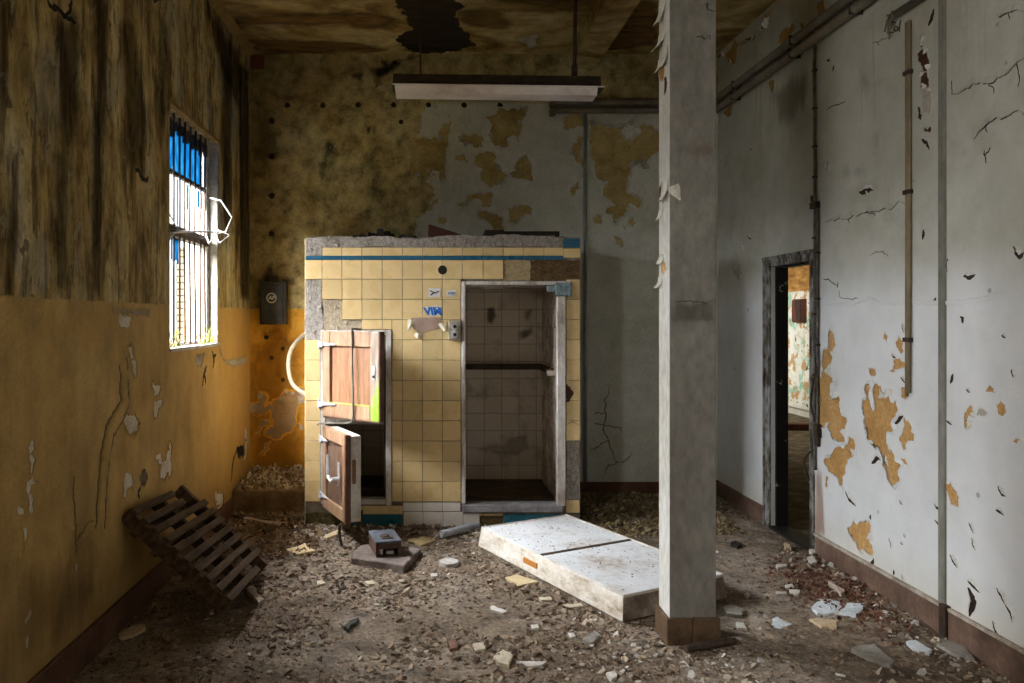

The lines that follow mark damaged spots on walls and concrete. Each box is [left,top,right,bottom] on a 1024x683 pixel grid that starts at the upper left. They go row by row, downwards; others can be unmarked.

leakage [8,160,18,290]
leakage [92,0,108,292]
leakage [124,26,145,172]
leakage [208,10,249,298]
peeling [305,106,581,256]
peeling [503,260,580,281]
peeling [562,114,659,248]
crack [826,200,905,222]
crack [951,58,1024,163]
crack [568,384,632,474]
peeling [819,323,917,504]
peeling [847,510,879,562]